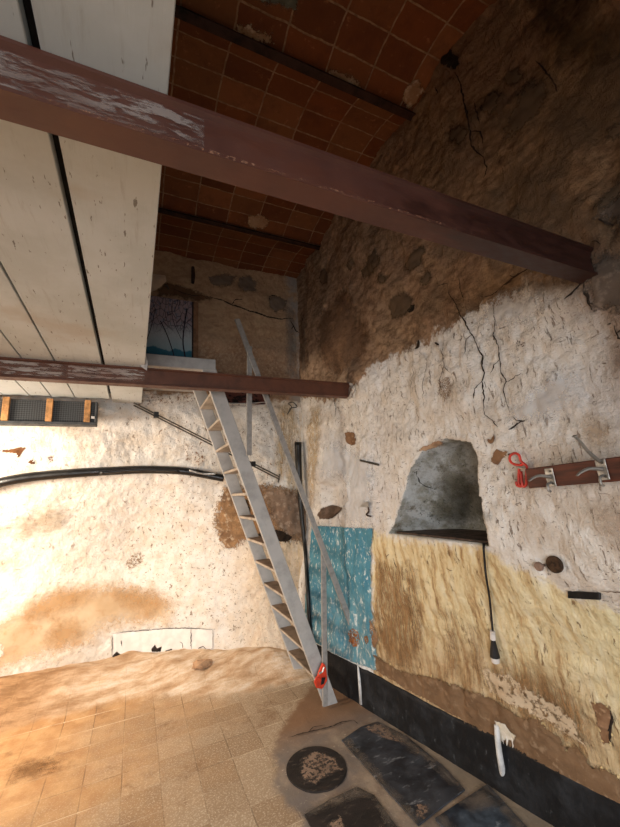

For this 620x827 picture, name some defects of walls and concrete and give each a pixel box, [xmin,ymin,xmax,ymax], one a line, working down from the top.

crack [455,72,487,176]
crack [174,289,299,333]
crack [409,343,449,405]
crack [437,269,527,430]
damp [0,584,168,667]
peeling [364,619,620,804]